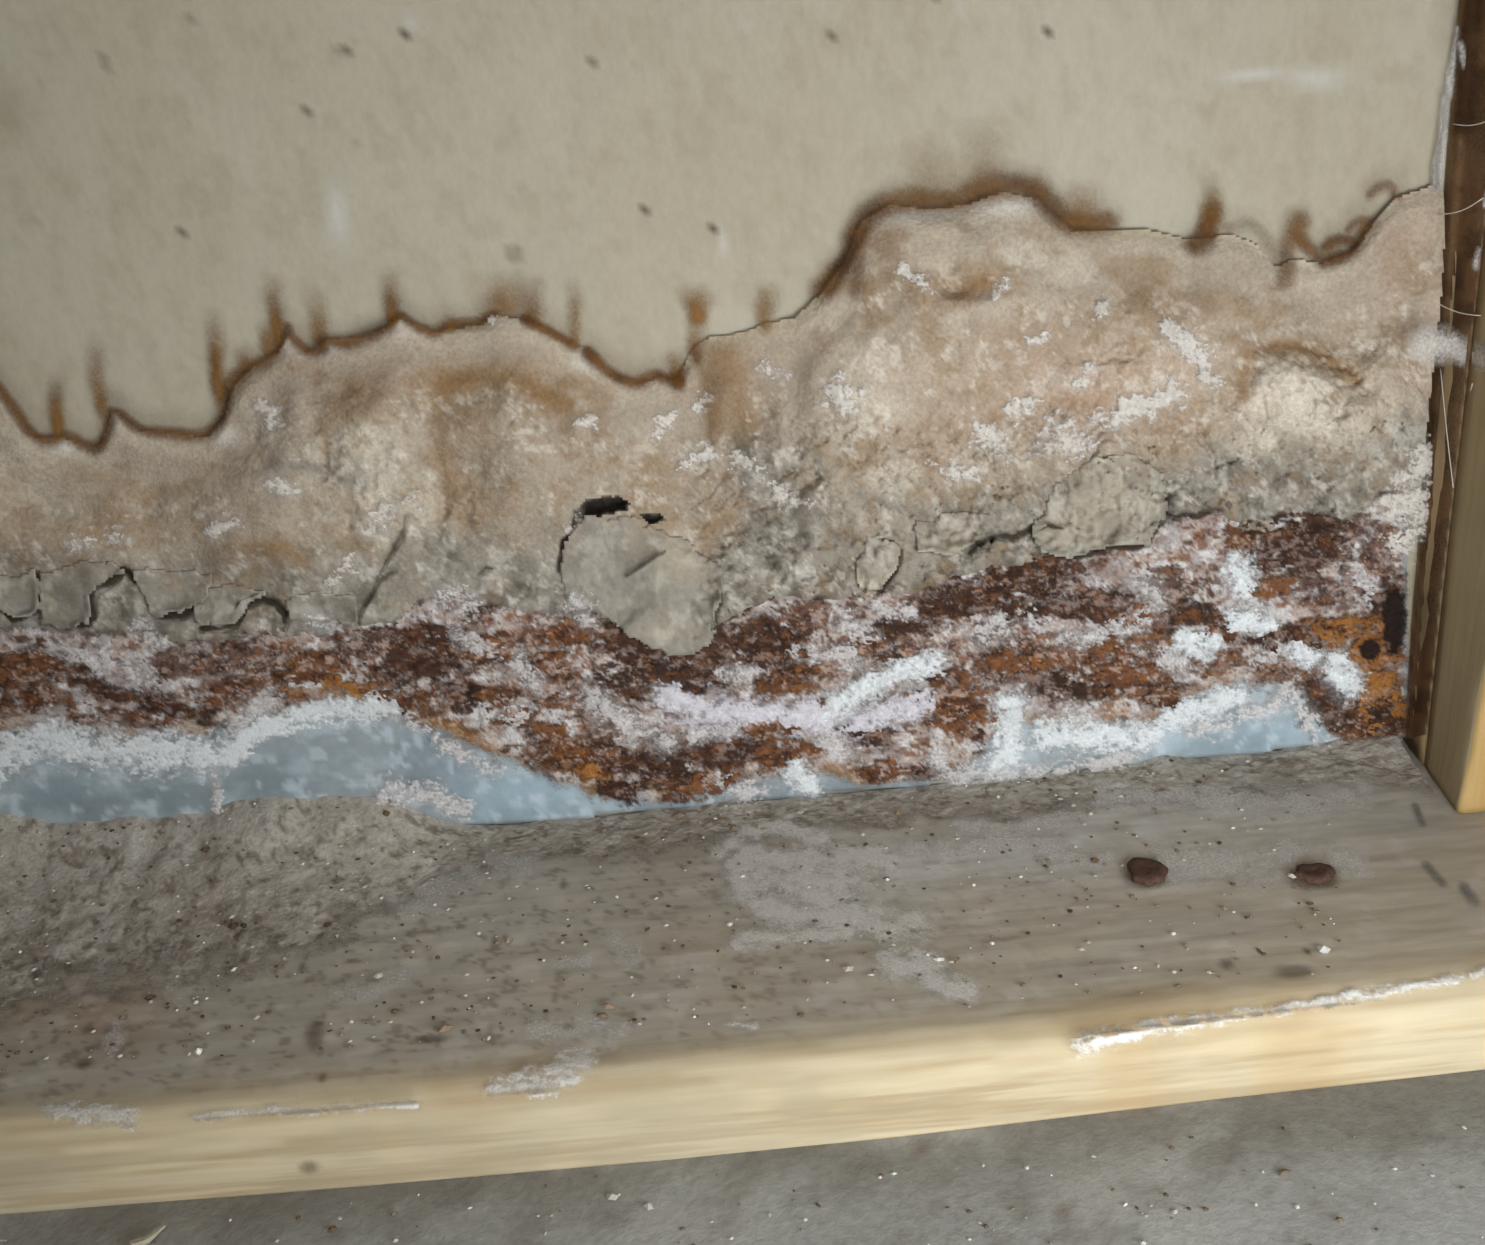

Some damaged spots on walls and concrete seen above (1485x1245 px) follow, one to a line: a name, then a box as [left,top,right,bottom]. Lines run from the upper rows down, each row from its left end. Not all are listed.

water stain [814,175,1117,296]
water stain [1188,205,1222,254]
water stain [1280,216,1376,286]
water stain [0,293,714,455]
efflorescence [924,317,1228,482]
efflorescence [675,441,817,512]
crack [557,511,577,572]
crack [968,494,1220,560]
crack [0,572,40,623]
crack [77,567,136,628]
crack [164,594,288,631]
rust [0,489,1408,809]